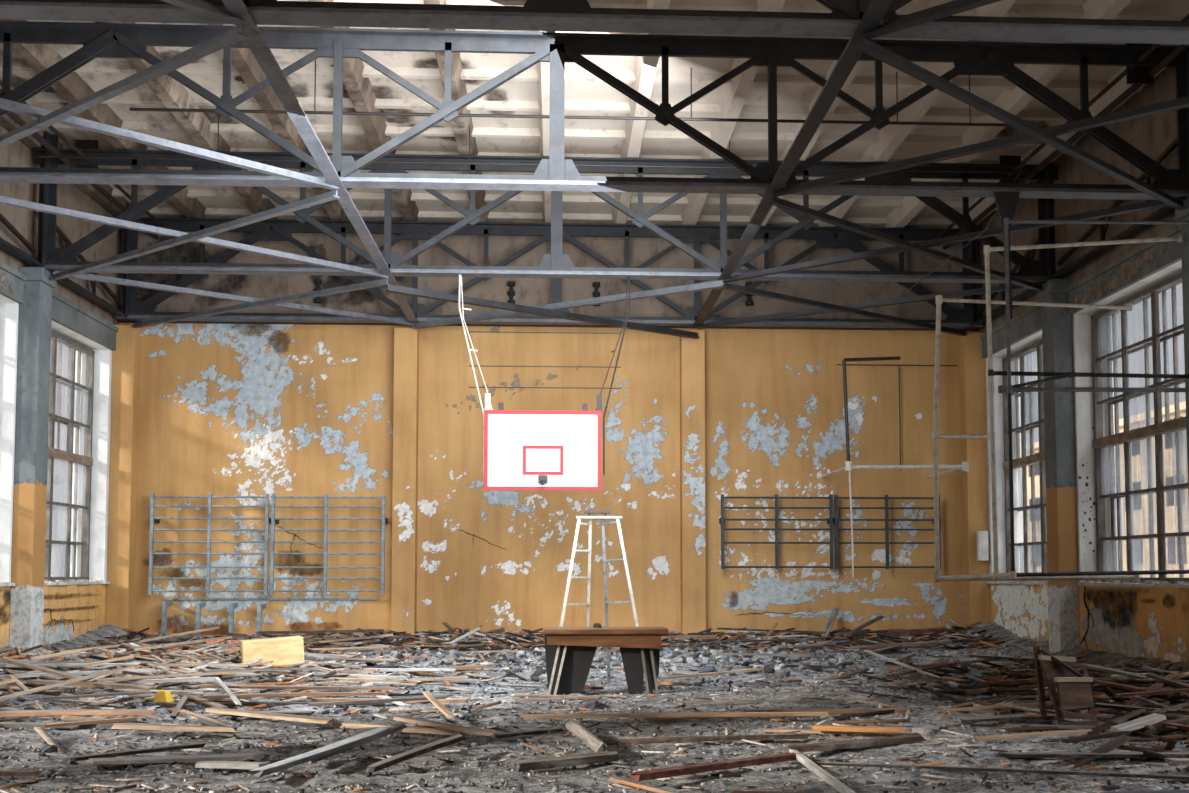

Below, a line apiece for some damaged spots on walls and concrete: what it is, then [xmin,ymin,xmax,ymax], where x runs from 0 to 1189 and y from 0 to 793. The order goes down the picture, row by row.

peeling [141,323,393,628]
peeling [394,374,964,633]
water stain [1086,590,1184,628]